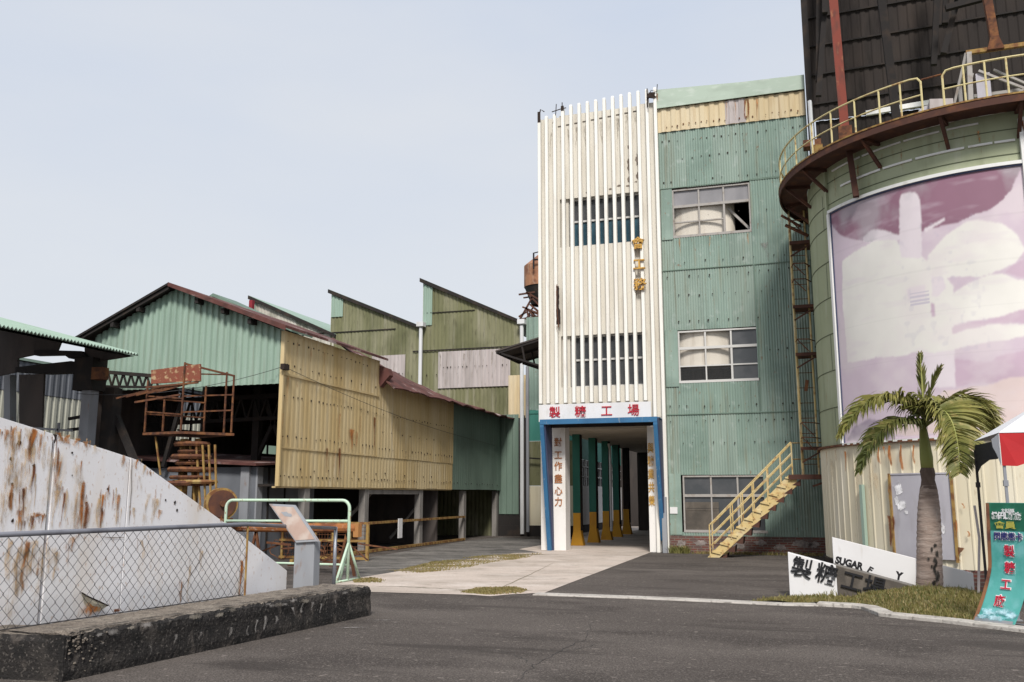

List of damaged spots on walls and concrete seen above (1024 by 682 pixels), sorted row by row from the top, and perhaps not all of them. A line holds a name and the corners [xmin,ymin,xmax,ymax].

rust [0,426,162,594]